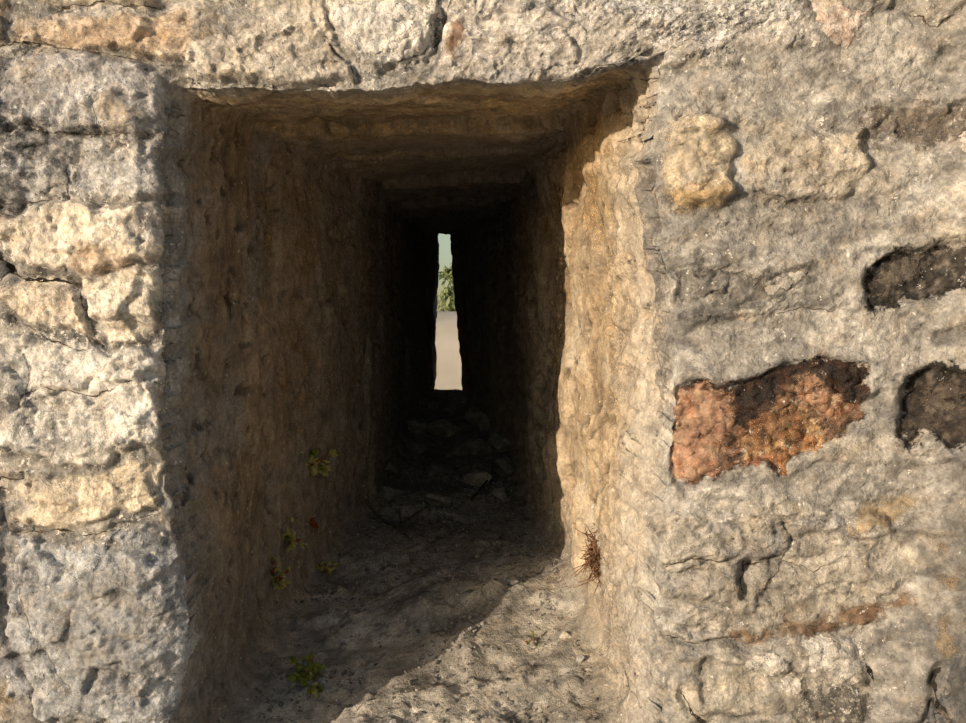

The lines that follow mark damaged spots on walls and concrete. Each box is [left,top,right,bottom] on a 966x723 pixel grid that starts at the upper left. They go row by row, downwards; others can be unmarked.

crack [384,1,451,72]
crack [0,166,70,208]
crack [0,252,102,351]
spalling [863,238,966,317]
spalling [669,355,870,484]
spalling [894,360,966,453]
crack [666,525,829,604]
crack [926,667,952,723]